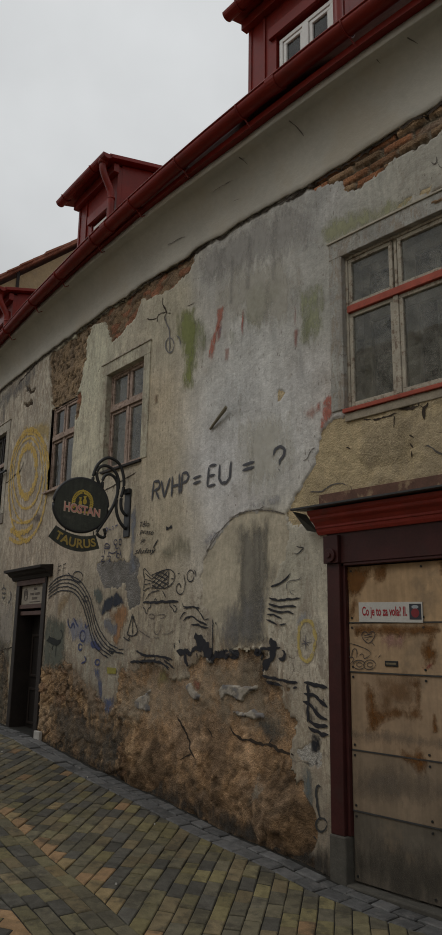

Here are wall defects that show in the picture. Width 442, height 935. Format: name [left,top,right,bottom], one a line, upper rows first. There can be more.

spalling [307,105,442,192]
spalling [50,252,195,420]
spalling [37,388,442,846]
crack [177,717,293,760]